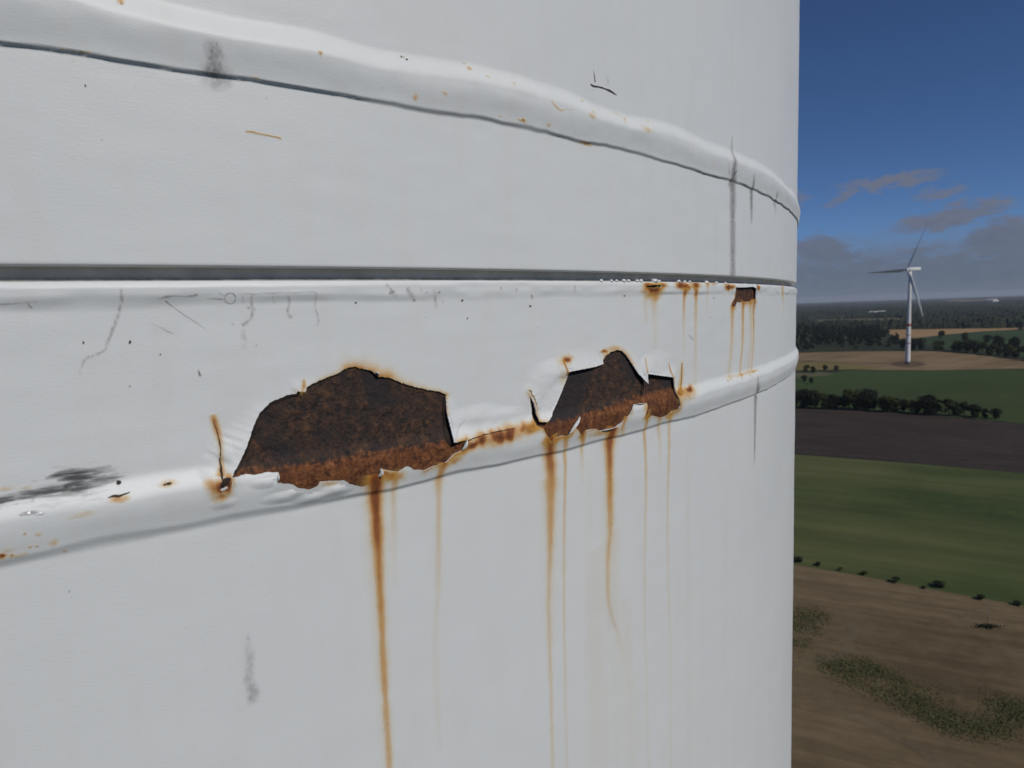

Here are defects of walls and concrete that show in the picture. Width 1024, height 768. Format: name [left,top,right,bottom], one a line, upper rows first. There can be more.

rust [644,282,760,326]
peeling [732,287,755,307]
peeling [233,366,468,490]
rust [346,365,391,378]
peeling [530,350,680,438]
rust [367,470,402,712]